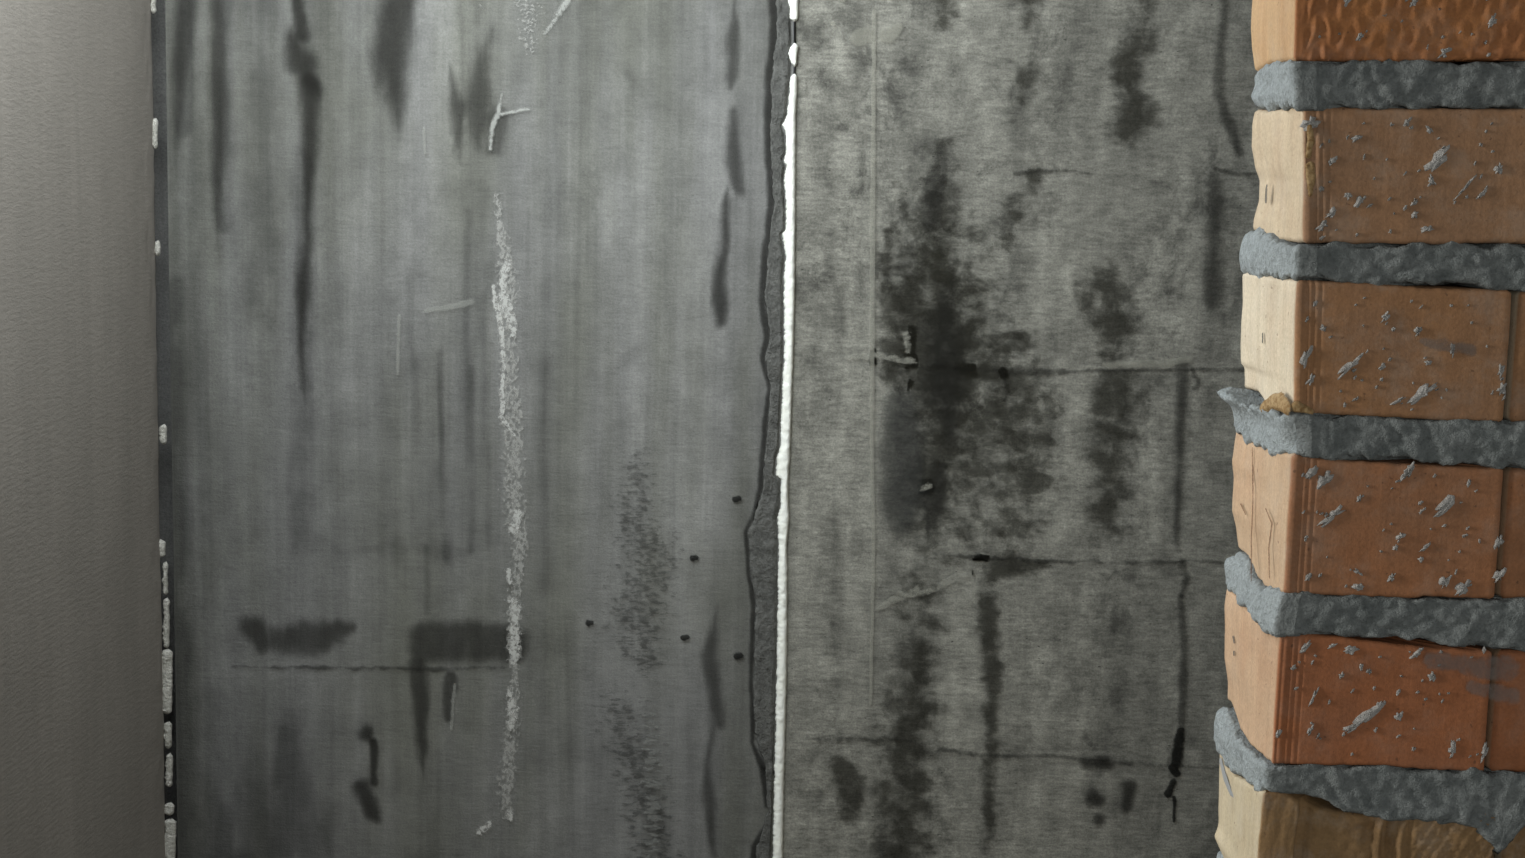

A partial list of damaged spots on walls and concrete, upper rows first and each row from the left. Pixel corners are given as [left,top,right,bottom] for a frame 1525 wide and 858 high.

leakage [288,0,318,239]
leakage [378,0,412,110]
leakage [1110,29,1153,140]
leakage [881,181,1051,535]
leakage [412,194,528,834]
crack [958,554,1064,563]
leakage [831,642,936,858]
leakage [977,554,1045,839]